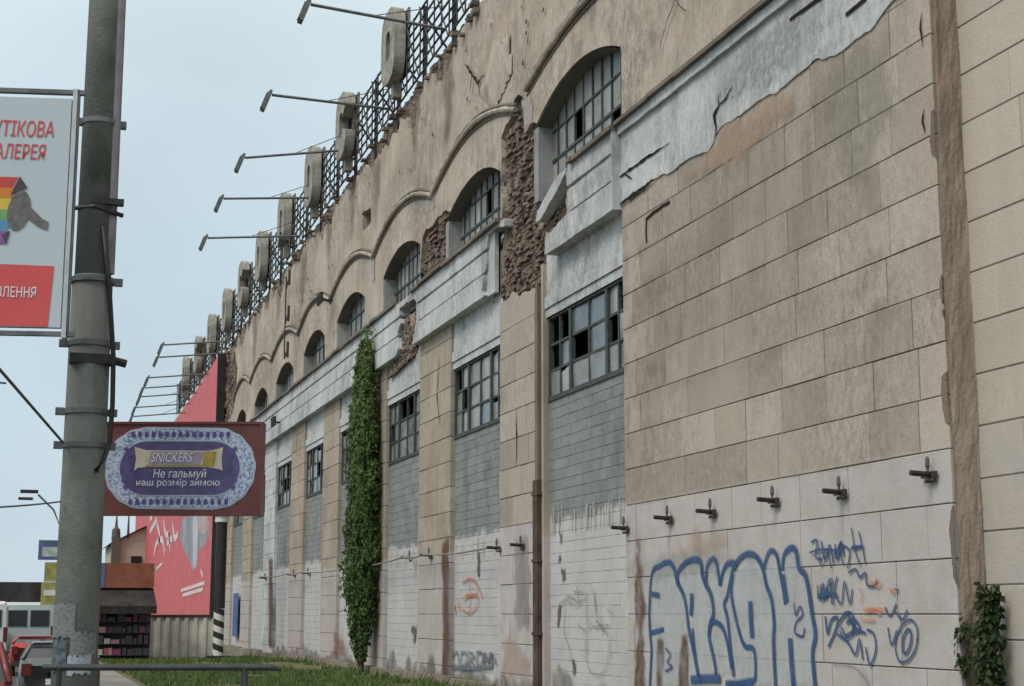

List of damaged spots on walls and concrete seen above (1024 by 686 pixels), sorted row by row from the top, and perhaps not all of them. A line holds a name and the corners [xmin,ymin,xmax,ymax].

crack [465,65,509,96]
crack [713,88,731,137]
flaking render [423,193,452,276]
flaking render [493,97,569,304]
crack [620,142,670,243]
flaking render [387,312,418,378]
rust [441,538,449,676]
rust [634,555,663,686]